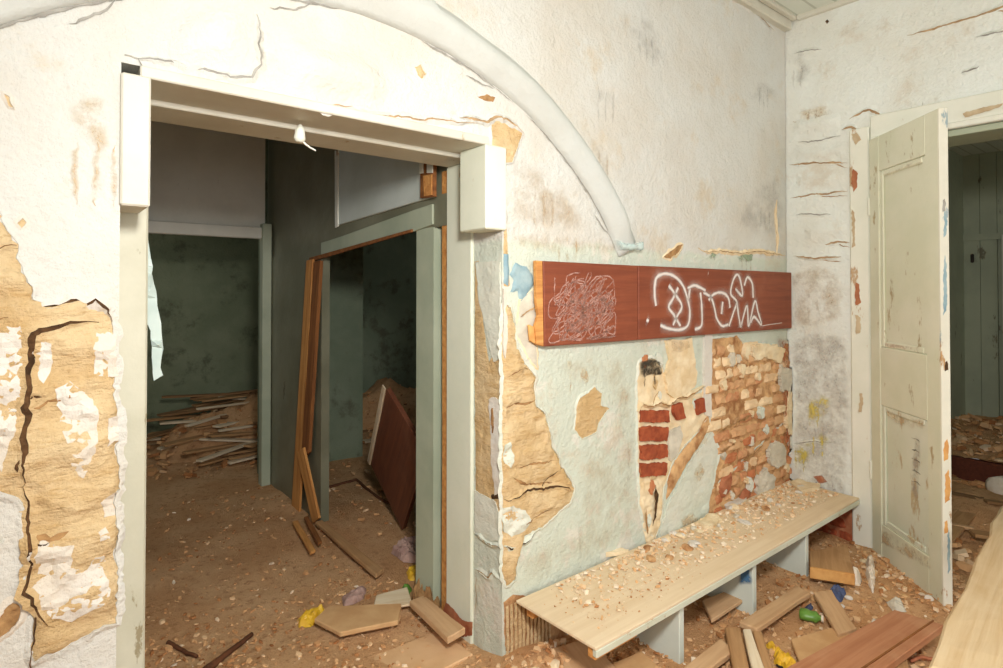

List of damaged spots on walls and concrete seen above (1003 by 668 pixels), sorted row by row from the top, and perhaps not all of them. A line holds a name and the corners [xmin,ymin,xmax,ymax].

crack [125,0,337,84]
crack [795,47,821,55]
crack [907,2,1003,39]
spalling [489,121,523,166]
crack [698,107,884,262]
crack [11,293,113,668]
spalling [0,197,128,668]
spalling [474,210,576,589]
spalling [573,385,610,440]
flaking render [635,332,793,543]